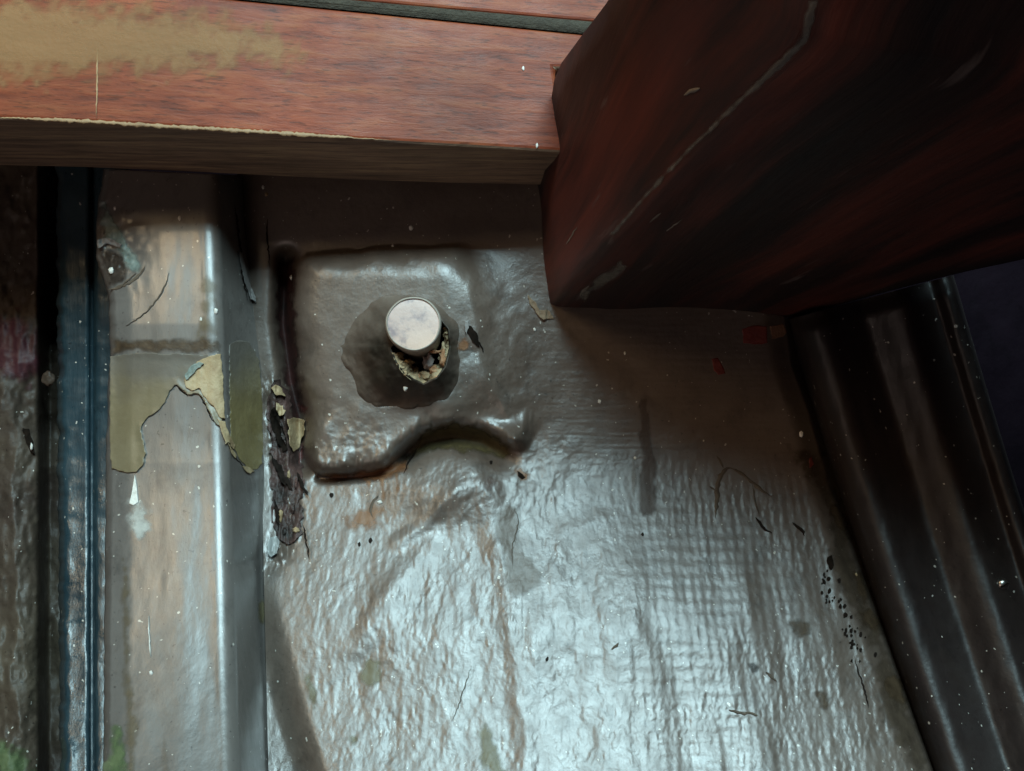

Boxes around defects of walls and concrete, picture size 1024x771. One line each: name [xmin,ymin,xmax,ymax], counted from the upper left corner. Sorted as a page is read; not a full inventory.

peeling [109,341,305,474]
crack [710,456,805,536]